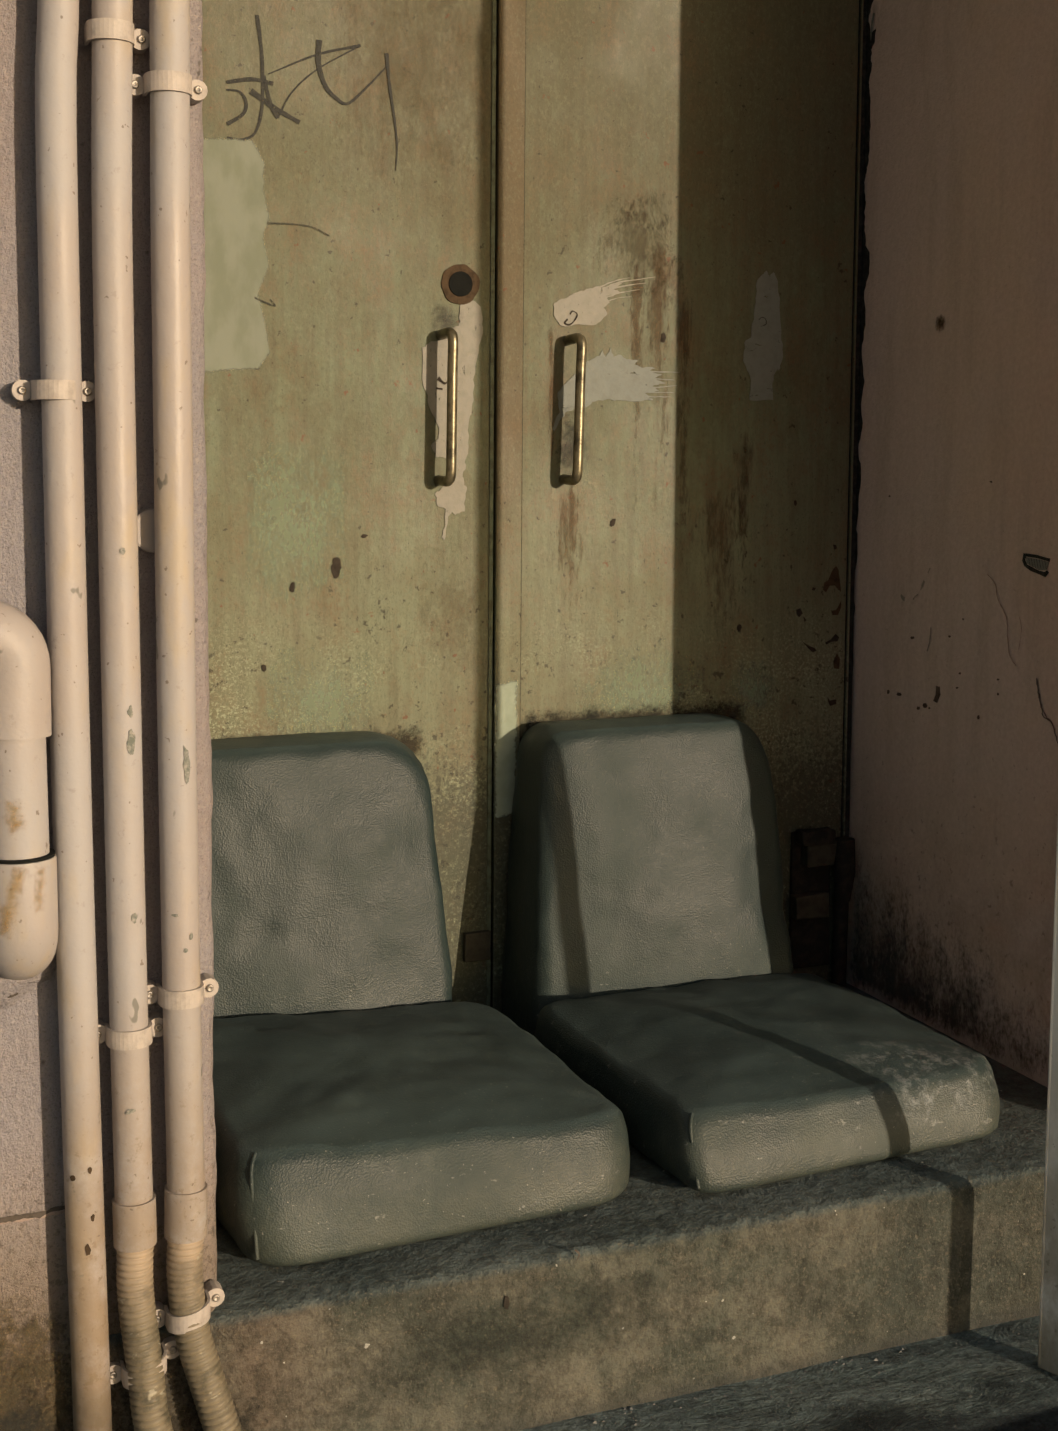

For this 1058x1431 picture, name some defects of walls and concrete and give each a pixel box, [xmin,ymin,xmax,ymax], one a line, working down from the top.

leakage [851,887,1043,1063]
crack [0,1205,65,1224]
leakage [0,1303,73,1431]